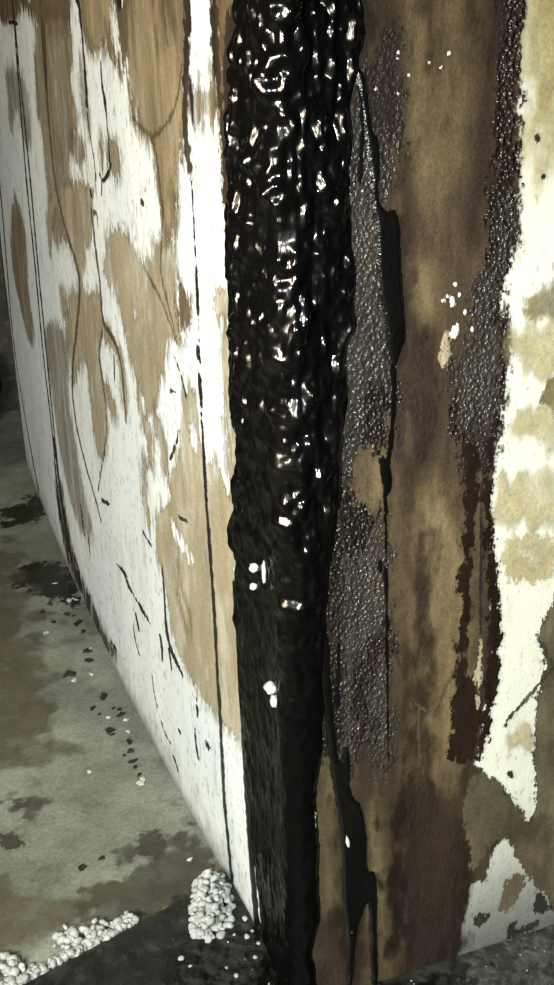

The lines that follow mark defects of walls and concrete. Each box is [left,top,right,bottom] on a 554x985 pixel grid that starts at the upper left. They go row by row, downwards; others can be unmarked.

water stain [0,0,241,767]
water stain [312,0,554,985]
water stain [0,798,47,820]
water stain [0,823,214,952]
crack [111,563,210,772]
peeling [462,594,554,939]